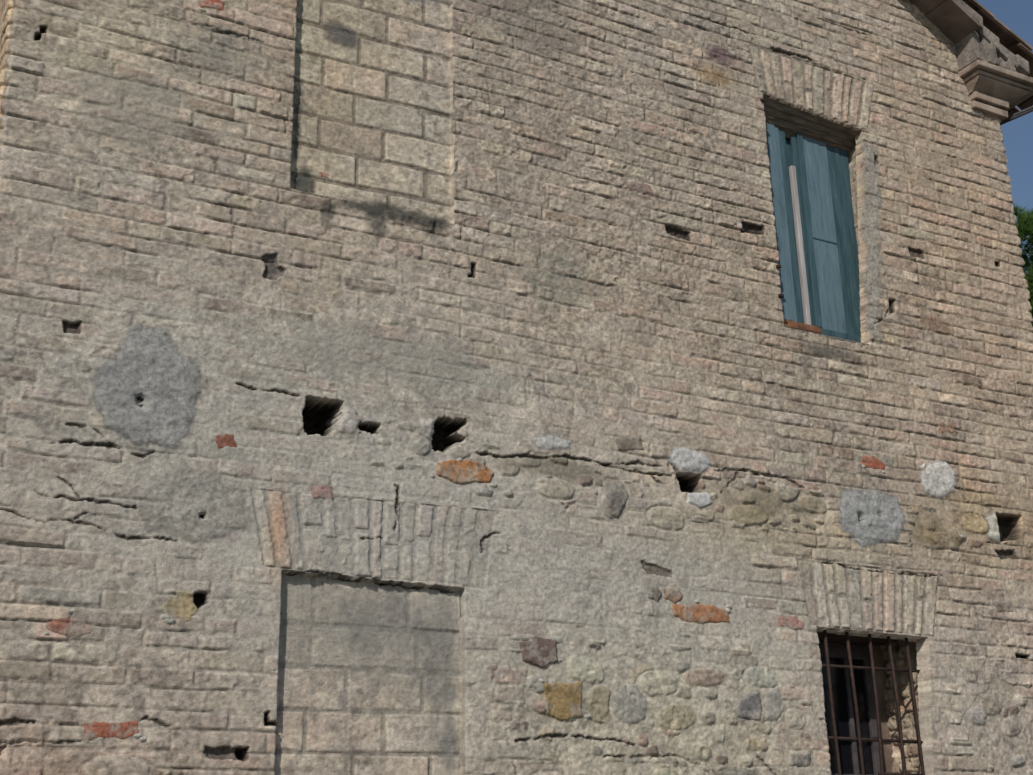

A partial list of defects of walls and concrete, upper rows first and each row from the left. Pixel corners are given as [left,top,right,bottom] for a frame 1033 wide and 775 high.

damp [294,169,312,193]
damp [343,200,447,230]
spalling [262,253,286,280]
spalling [302,401,337,436]
crack [52,423,153,458]
spalling [430,420,498,488]
crack [476,452,672,484]
crack [714,467,804,493]
crack [0,477,176,542]
crack [361,484,400,540]
crack [515,734,640,759]